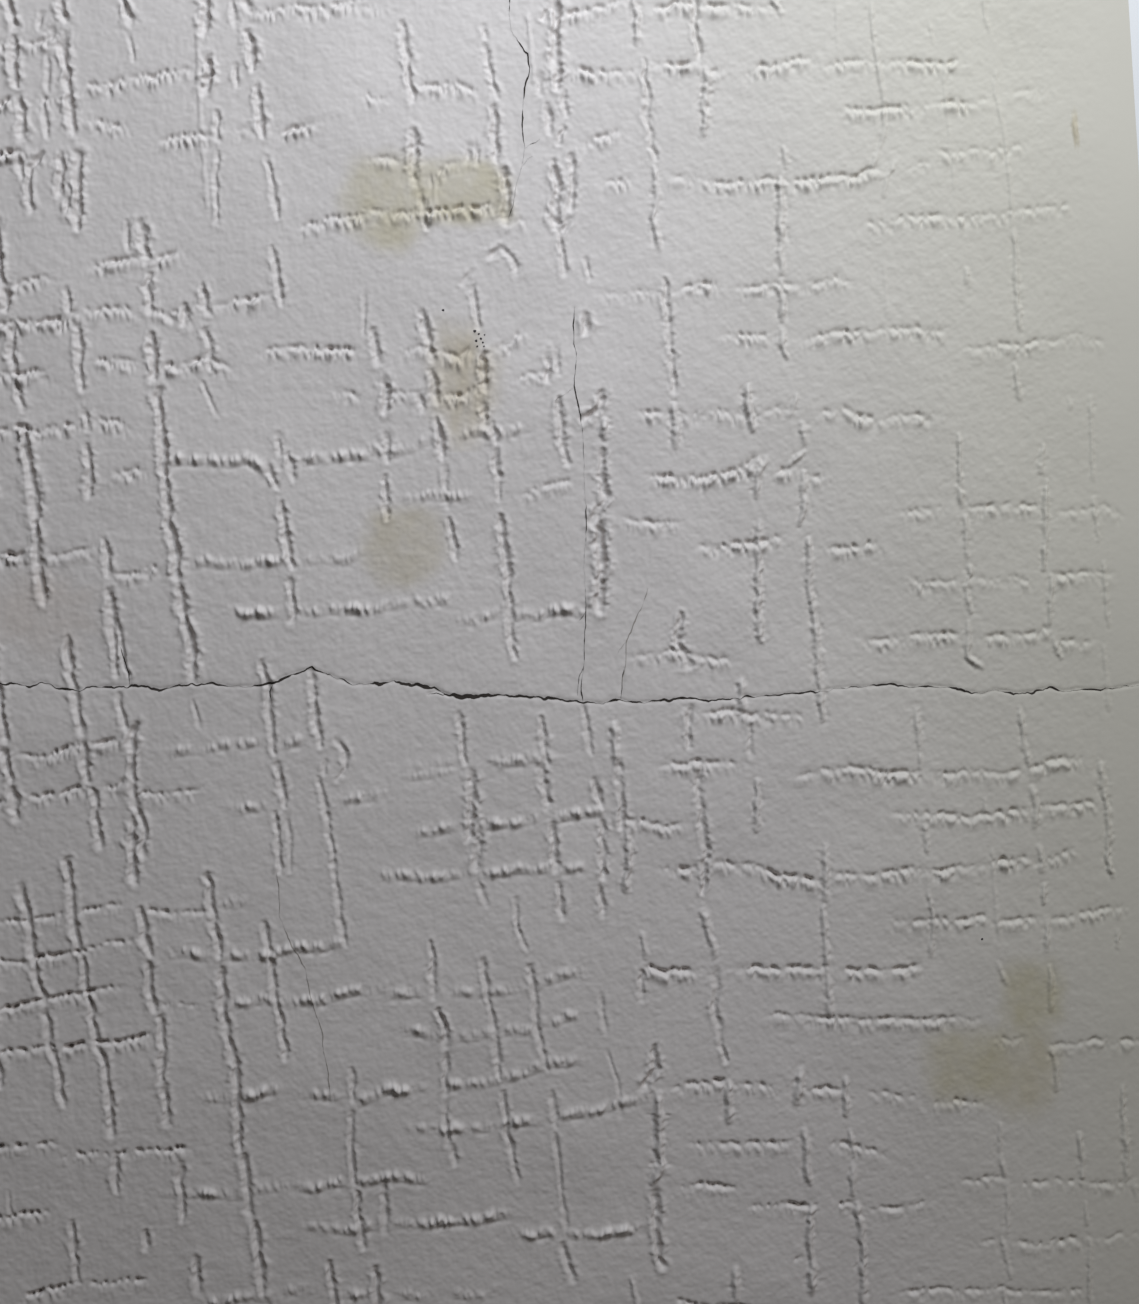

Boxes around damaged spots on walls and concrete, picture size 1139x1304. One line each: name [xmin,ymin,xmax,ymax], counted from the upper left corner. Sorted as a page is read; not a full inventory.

crack [0,308,1138,704]